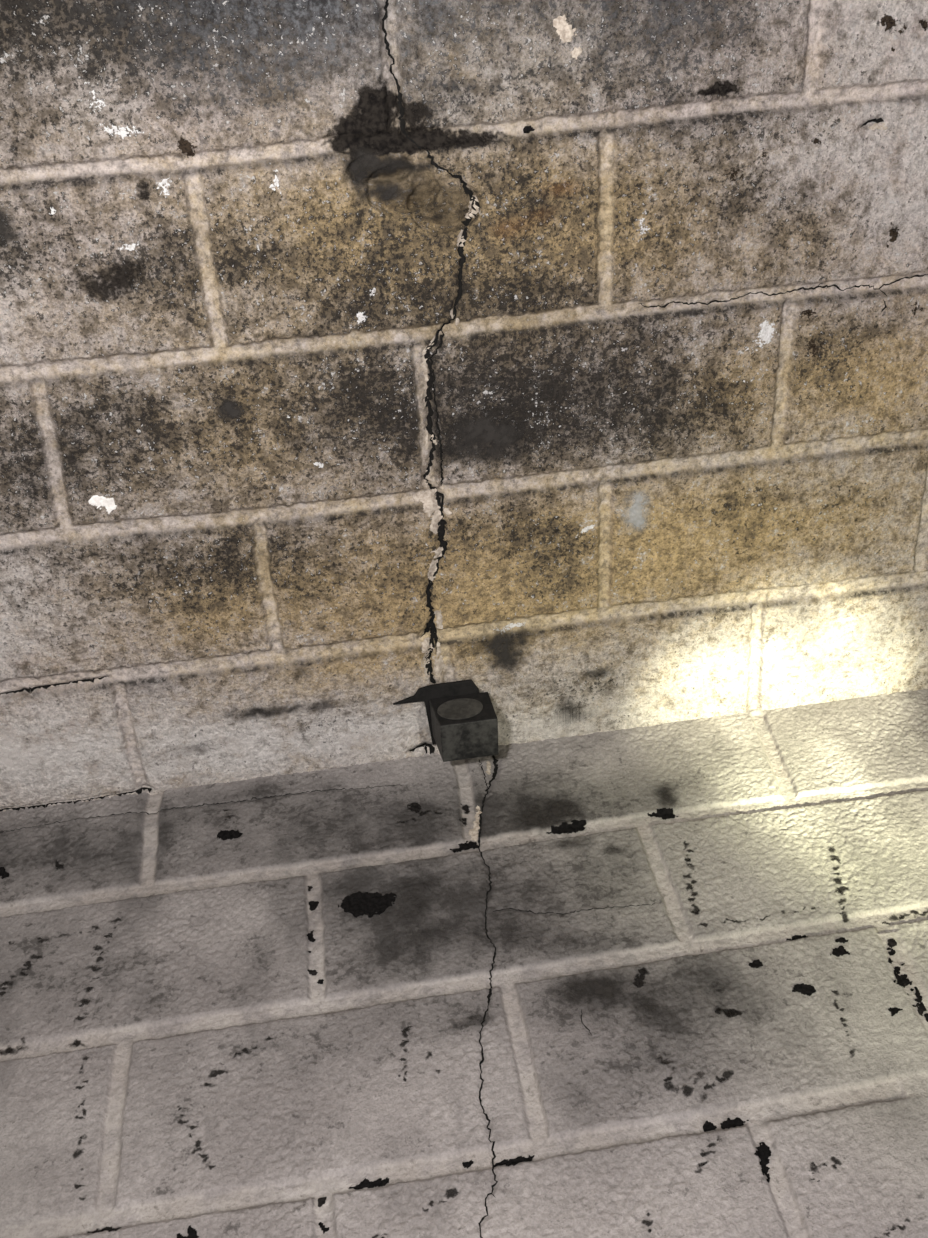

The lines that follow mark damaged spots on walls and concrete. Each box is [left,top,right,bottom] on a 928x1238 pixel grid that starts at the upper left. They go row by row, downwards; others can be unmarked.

damp [85,82,144,139]
damp [156,178,171,198]
crack [639,274,928,311]
crack [382,0,480,684]
crack [409,742,435,754]
crack [469,755,655,1238]
peeling [886,938,928,1022]